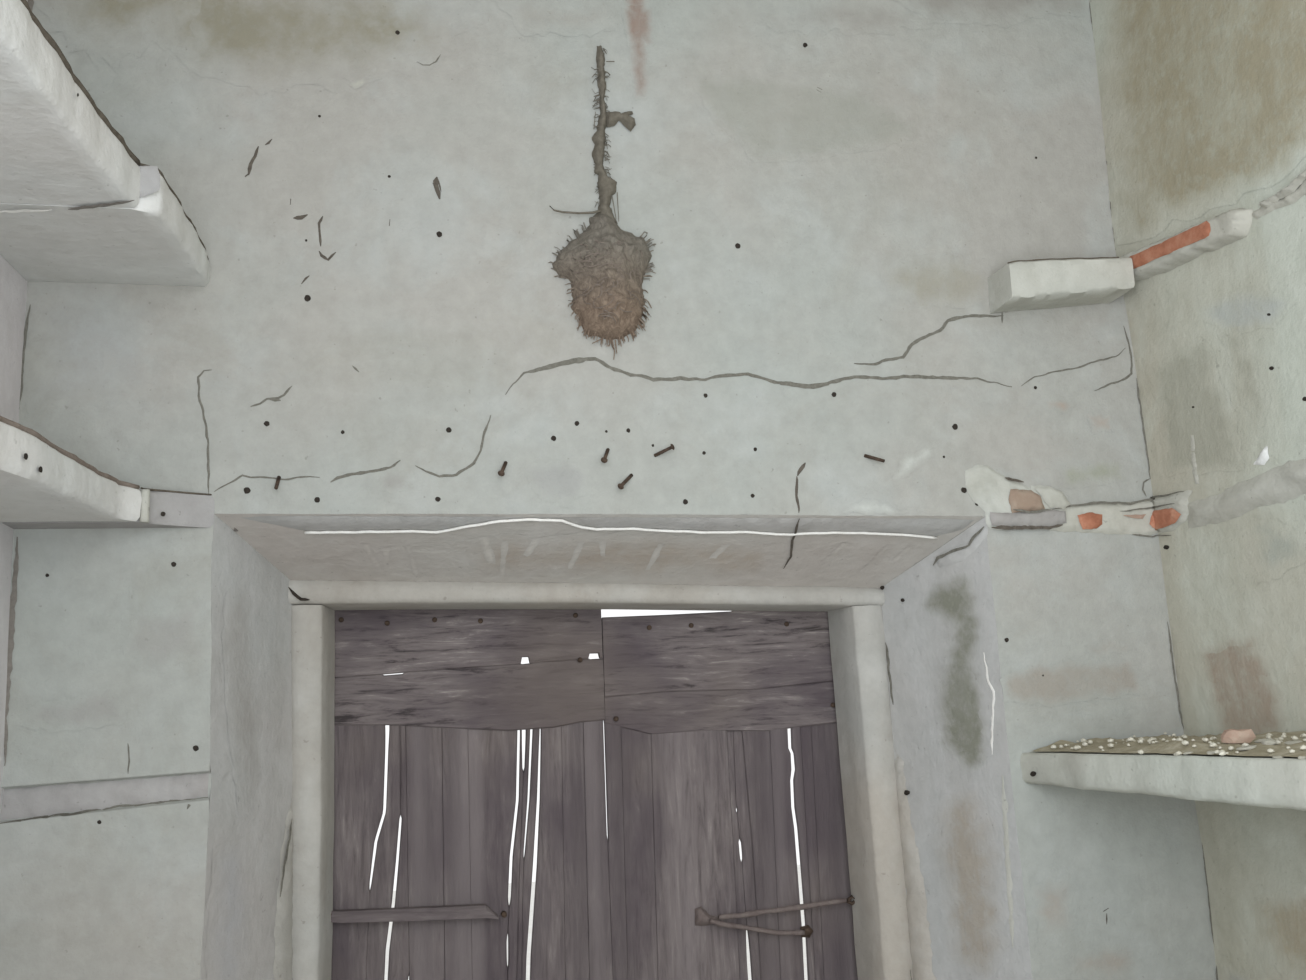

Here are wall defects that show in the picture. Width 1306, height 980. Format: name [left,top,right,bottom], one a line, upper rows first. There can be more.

rust [621,0,656,100]
spalling [1120,169,1306,281]
crack [197,314,1151,497]
peeling [242,435,1199,567]
crack [783,463,806,569]
water stain [999,636,1144,707]
crack [0,797,208,824]
water stain [919,568,1012,980]